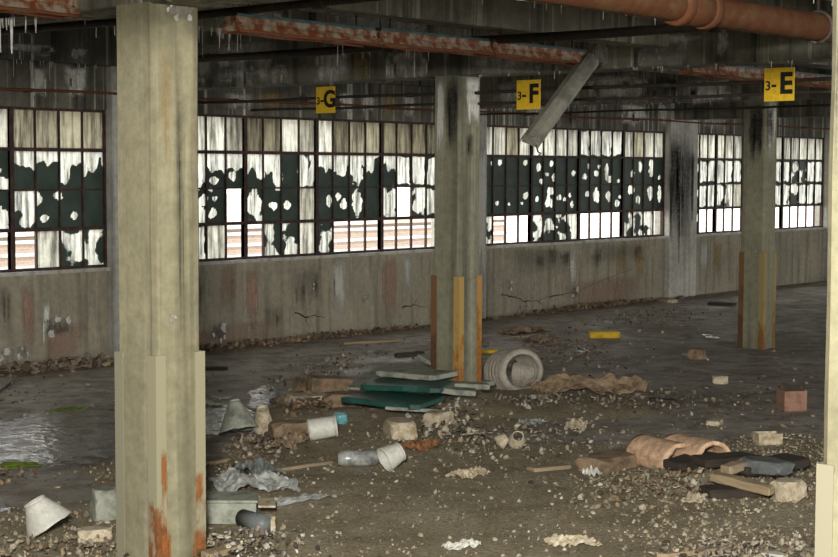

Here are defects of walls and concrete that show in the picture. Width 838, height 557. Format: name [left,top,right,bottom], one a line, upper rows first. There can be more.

damp [669,144,694,243]
crack [501,268,633,306]
flaking render [48,316,71,338]
corrosion [162,533,171,557]